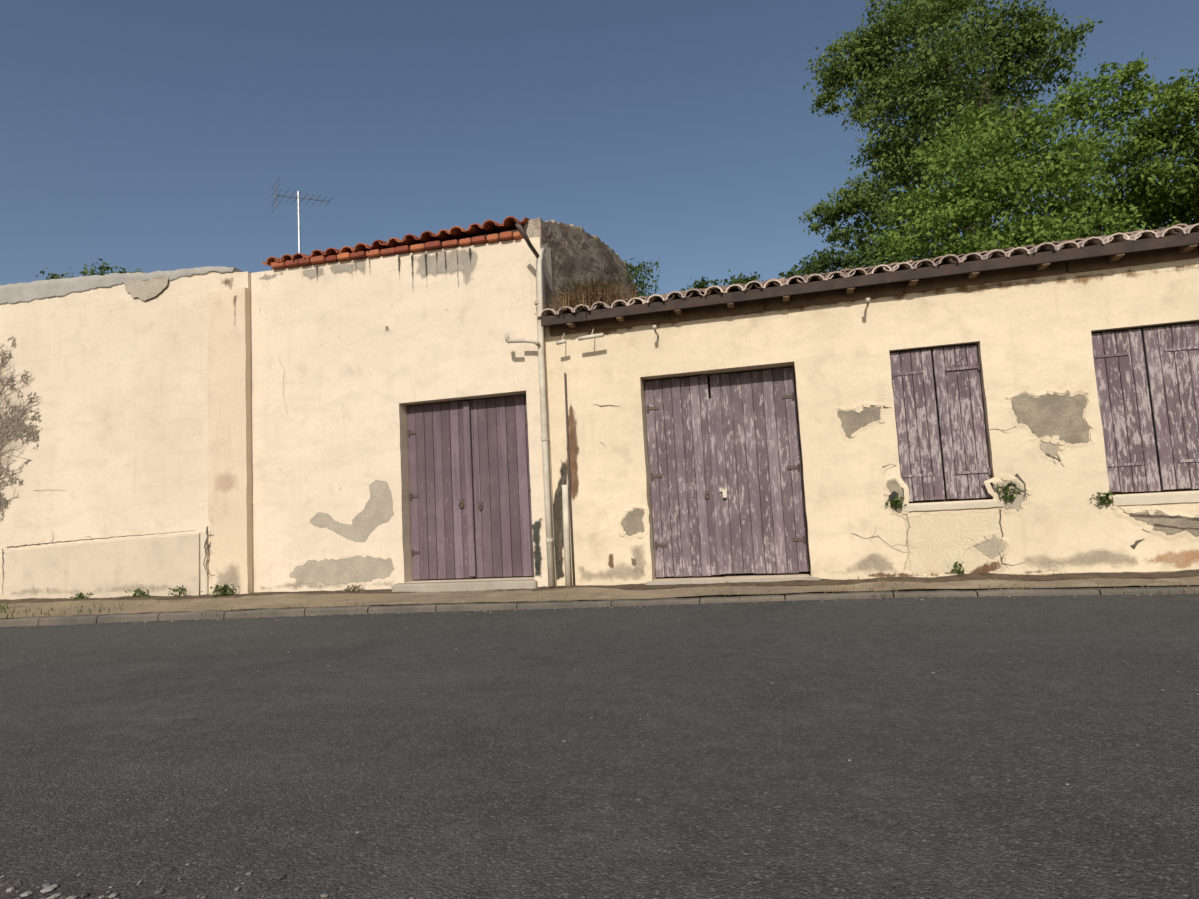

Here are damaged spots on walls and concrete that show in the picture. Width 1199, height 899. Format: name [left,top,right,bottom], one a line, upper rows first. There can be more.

leakage [398,248,477,287]
spalling [832,401,886,443]
spalling [1006,386,1096,465]
spalling [617,504,650,541]
spalling [1110,505,1199,543]